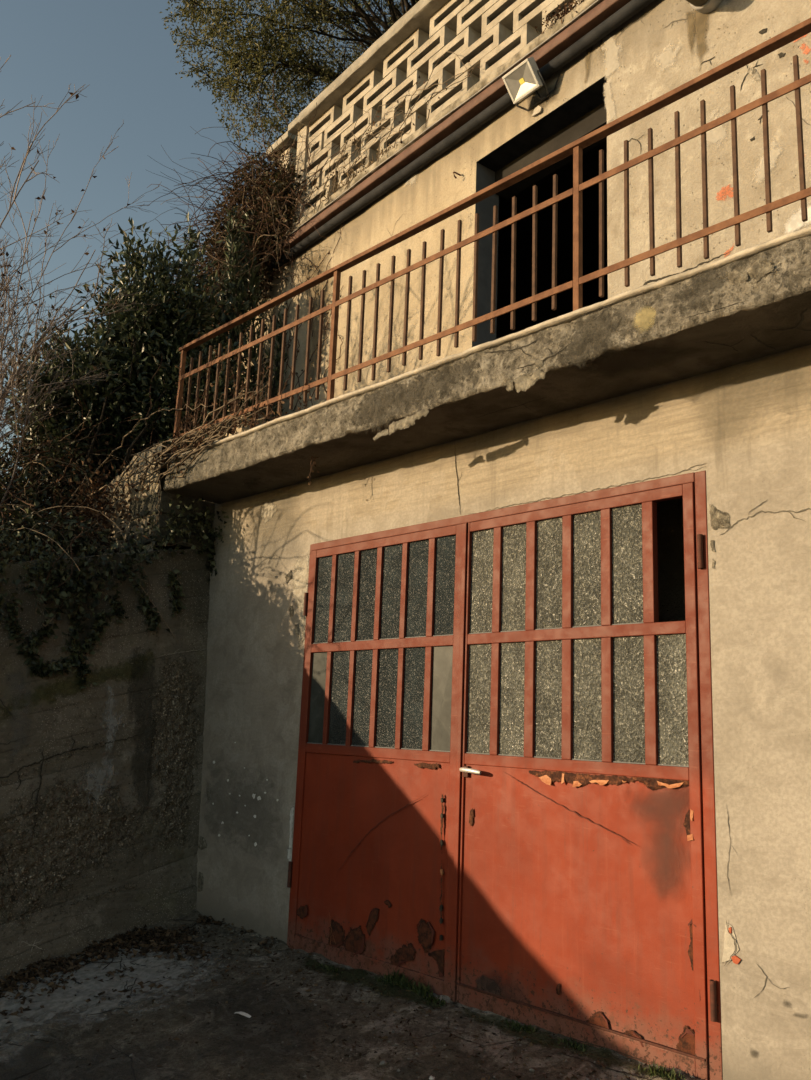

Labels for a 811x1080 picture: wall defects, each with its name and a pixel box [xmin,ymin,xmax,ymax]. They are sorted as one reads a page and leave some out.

damp [687,10,709,57]
spalling [635,307,656,329]
spalling [505,359,546,393]
spalling [373,408,429,441]
crack [455,455,706,514]
crack [720,499,811,535]
crack [0,699,151,838]
peeling [529,770,689,790]